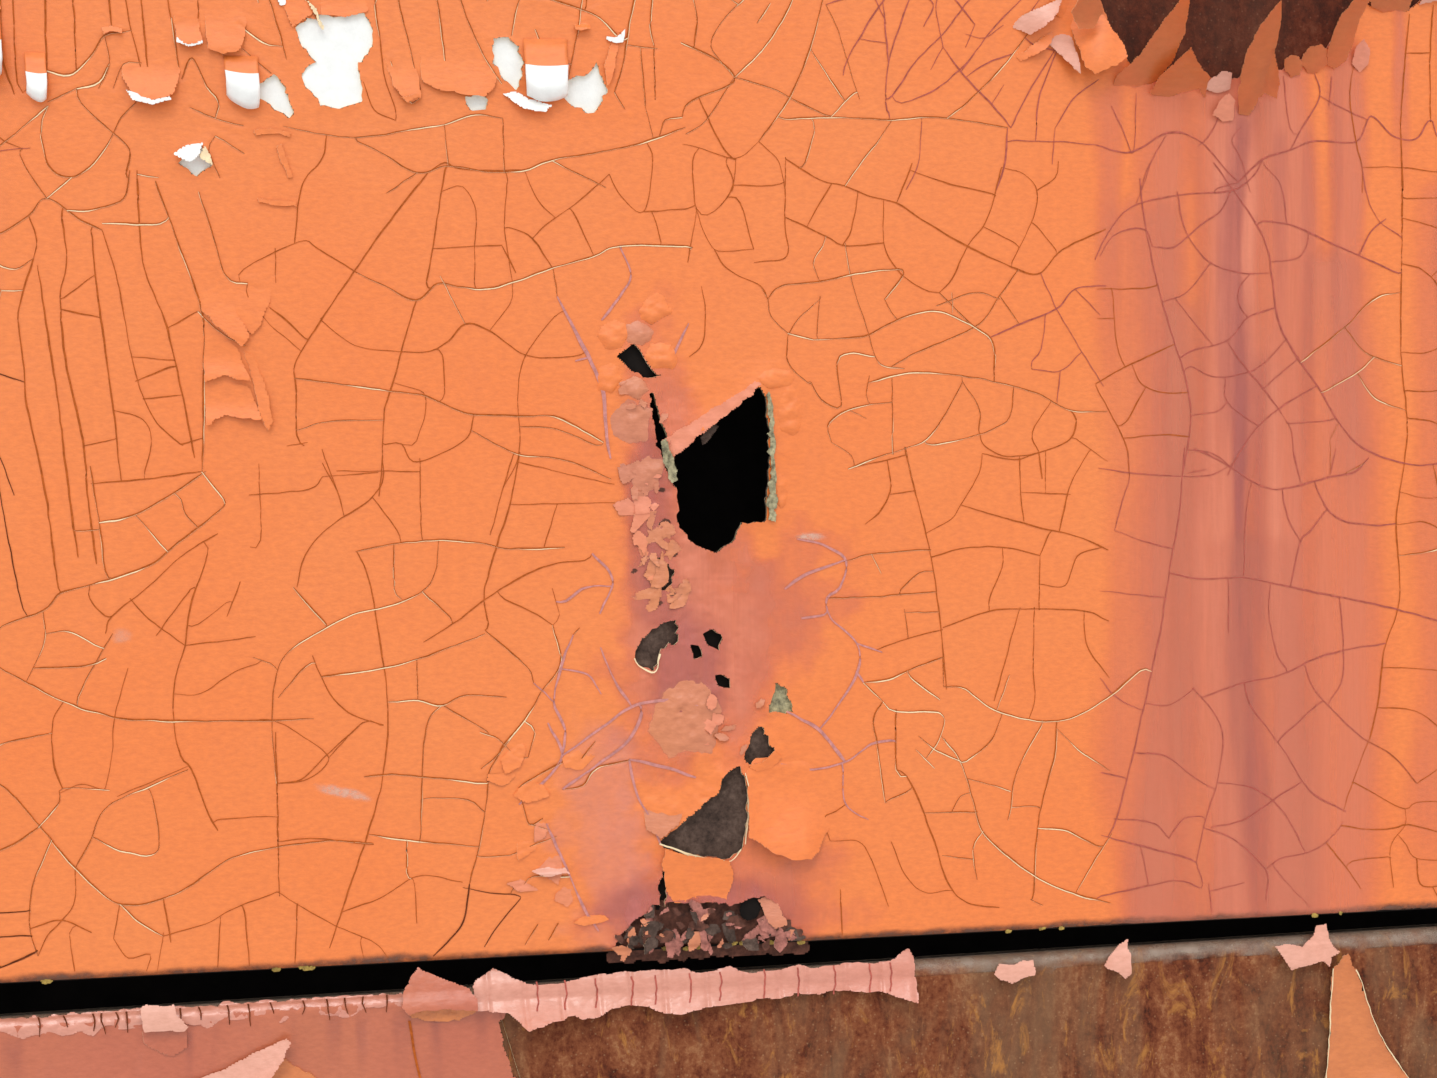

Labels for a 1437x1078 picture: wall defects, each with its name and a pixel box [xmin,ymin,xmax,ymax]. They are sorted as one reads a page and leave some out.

peeling [102,0,294,118]
peeling [278,0,625,113]
crack [827,371,1109,650]
corrosion [572,0,1437,964]
crack [1117,477,1437,899]
crack [277,602,696,960]
peeling [643,674,830,921]
crack [0,879,92,972]
corrosion [0,952,559,983]
peeling [0,949,919,1078]
corrosion [499,954,1331,1078]
corrosion [1351,944,1437,1078]